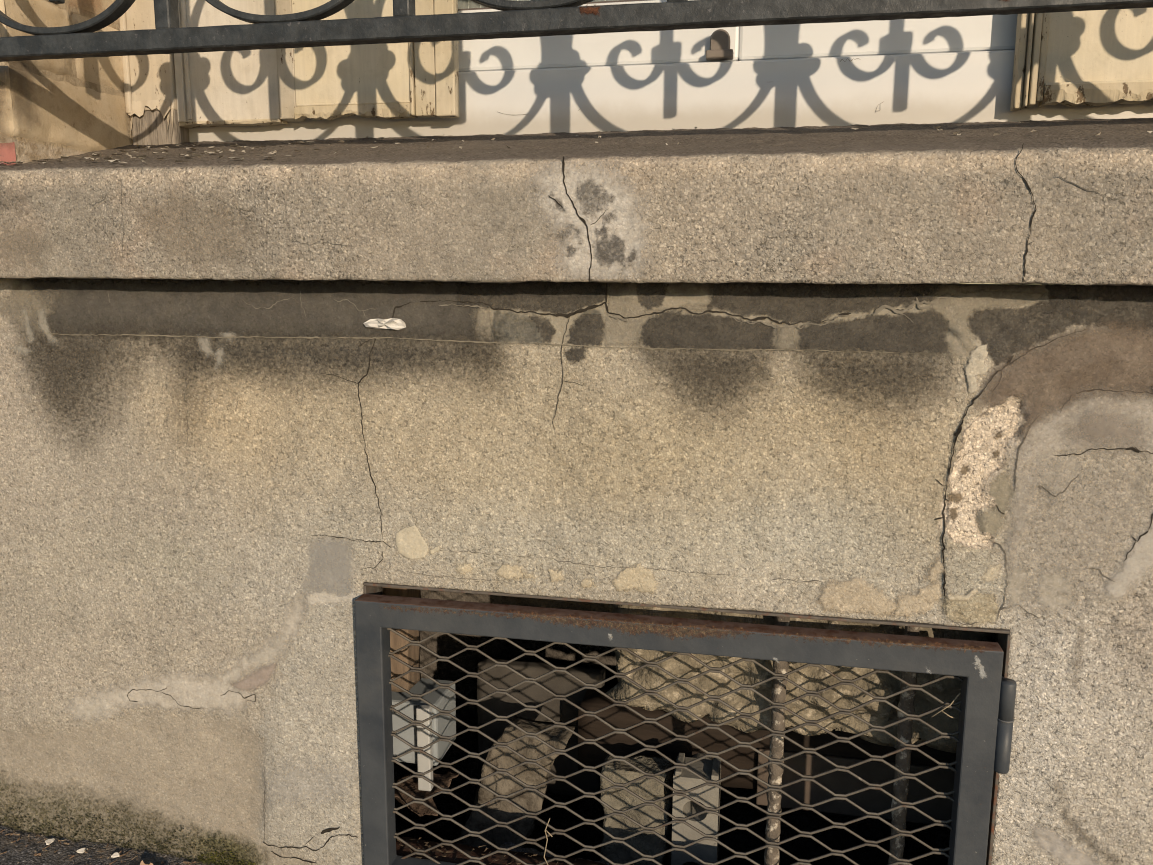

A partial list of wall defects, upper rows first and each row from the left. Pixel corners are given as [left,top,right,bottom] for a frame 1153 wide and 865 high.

crack [1015,143,1037,281]
leakage [0,281,145,429]
leakage [564,347,586,362]
crack [300,156,851,583]
leakage [604,282,713,345]
leakage [674,356,755,402]
leakage [820,357,931,397]
peeling [965,345,989,394]
spalling [946,396,1026,549]
crack [935,329,1085,625]
crack [995,389,1153,514]
crack [1092,514,1153,582]